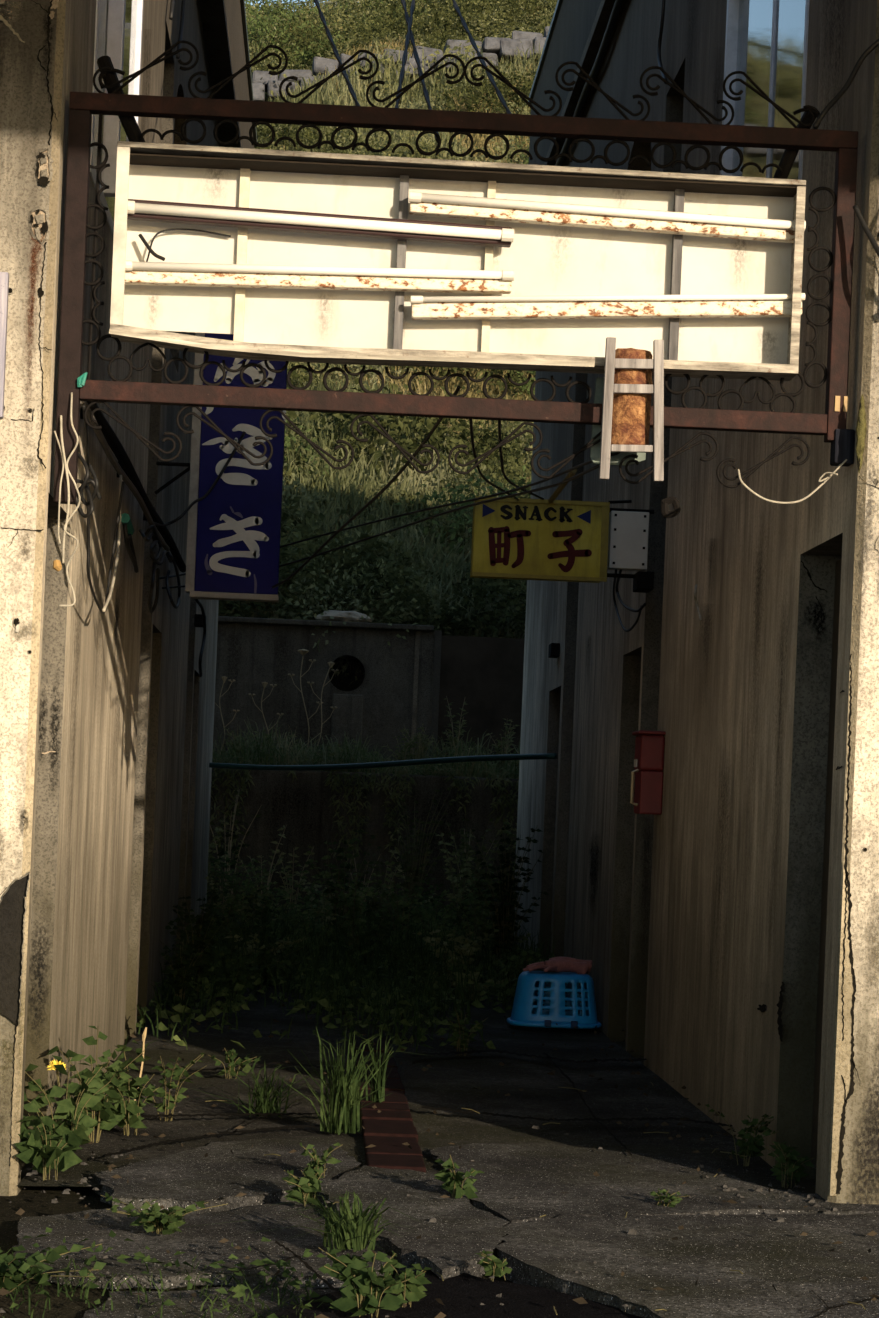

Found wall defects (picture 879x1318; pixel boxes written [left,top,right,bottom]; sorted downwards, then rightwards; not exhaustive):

peeling [0,871,31,1026]
crack [836,654,860,1194]
damp [853,1076,879,1204]